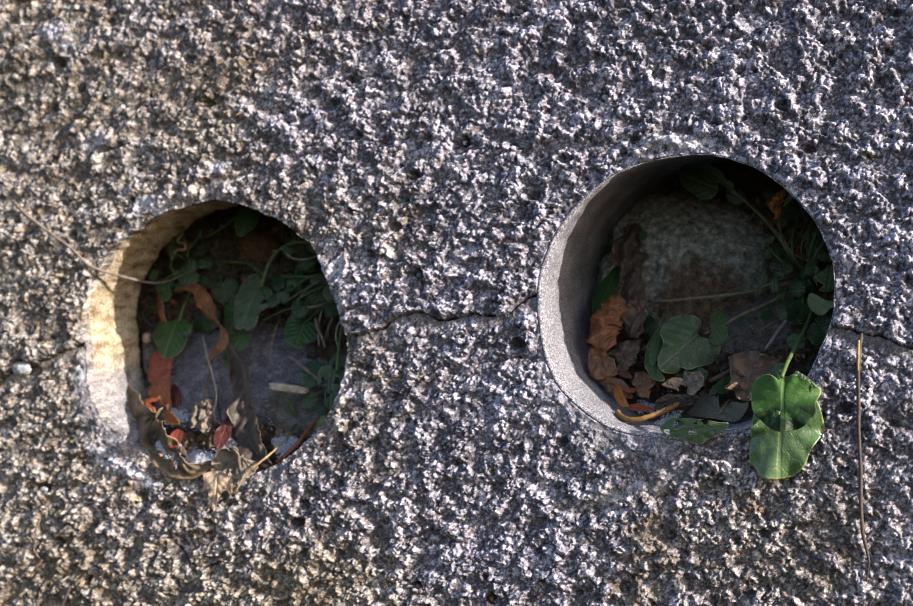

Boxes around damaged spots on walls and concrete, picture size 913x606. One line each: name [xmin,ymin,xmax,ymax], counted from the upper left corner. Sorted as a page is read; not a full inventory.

crack [430,294,497,322]